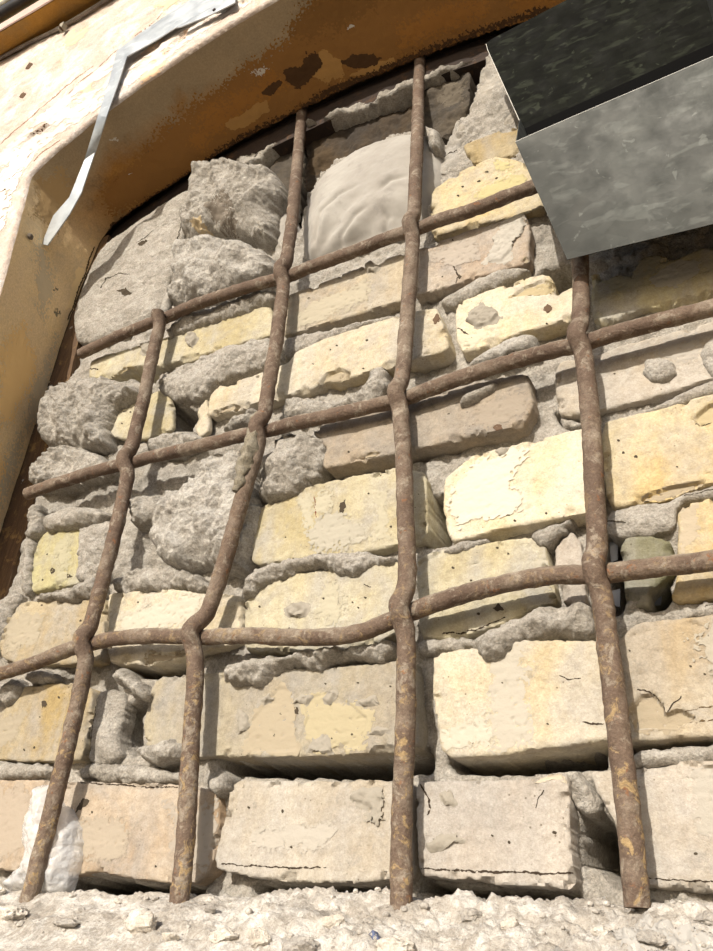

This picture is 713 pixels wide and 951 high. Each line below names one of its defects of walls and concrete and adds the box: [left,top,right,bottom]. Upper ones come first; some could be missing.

corrosion [62,25,89,47]
corrosion [94,0,566,217]
corrosion [28,163,83,240]
corrosion [420,236,481,269]
corrosion [472,387,530,431]
spalling [691,399,713,426]
corrosion [296,484,335,534]
corrosion [679,502,701,554]
corrosion [4,610,49,656]
crack [637,689,713,722]
corrosion [0,780,32,862]
corrosion [78,814,142,869]